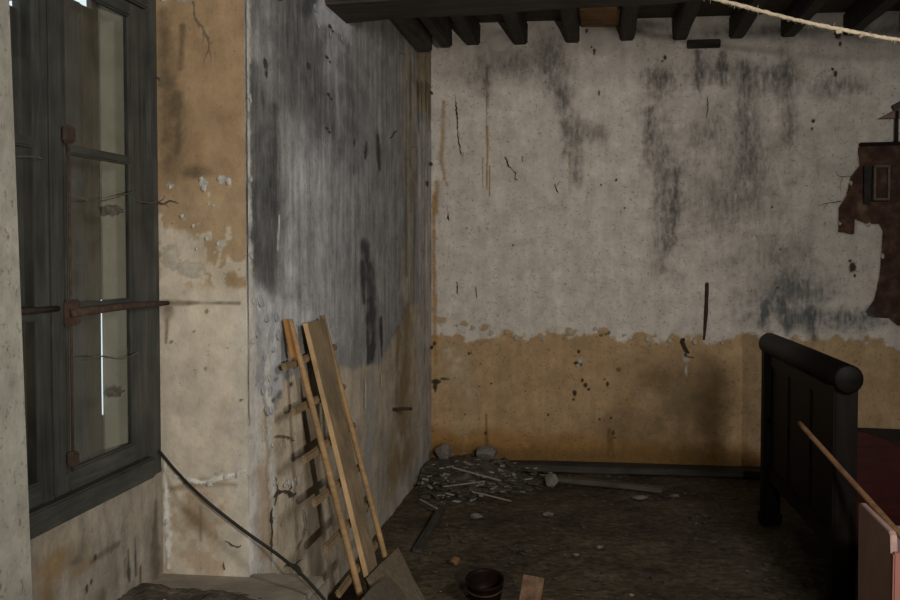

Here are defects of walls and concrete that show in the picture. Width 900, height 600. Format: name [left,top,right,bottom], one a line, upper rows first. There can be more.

crack [192,1,211,60]
peeling [199,175,231,192]
spalling [838,145,900,326]
leakage [759,279,822,338]
crack [270,477,310,573]